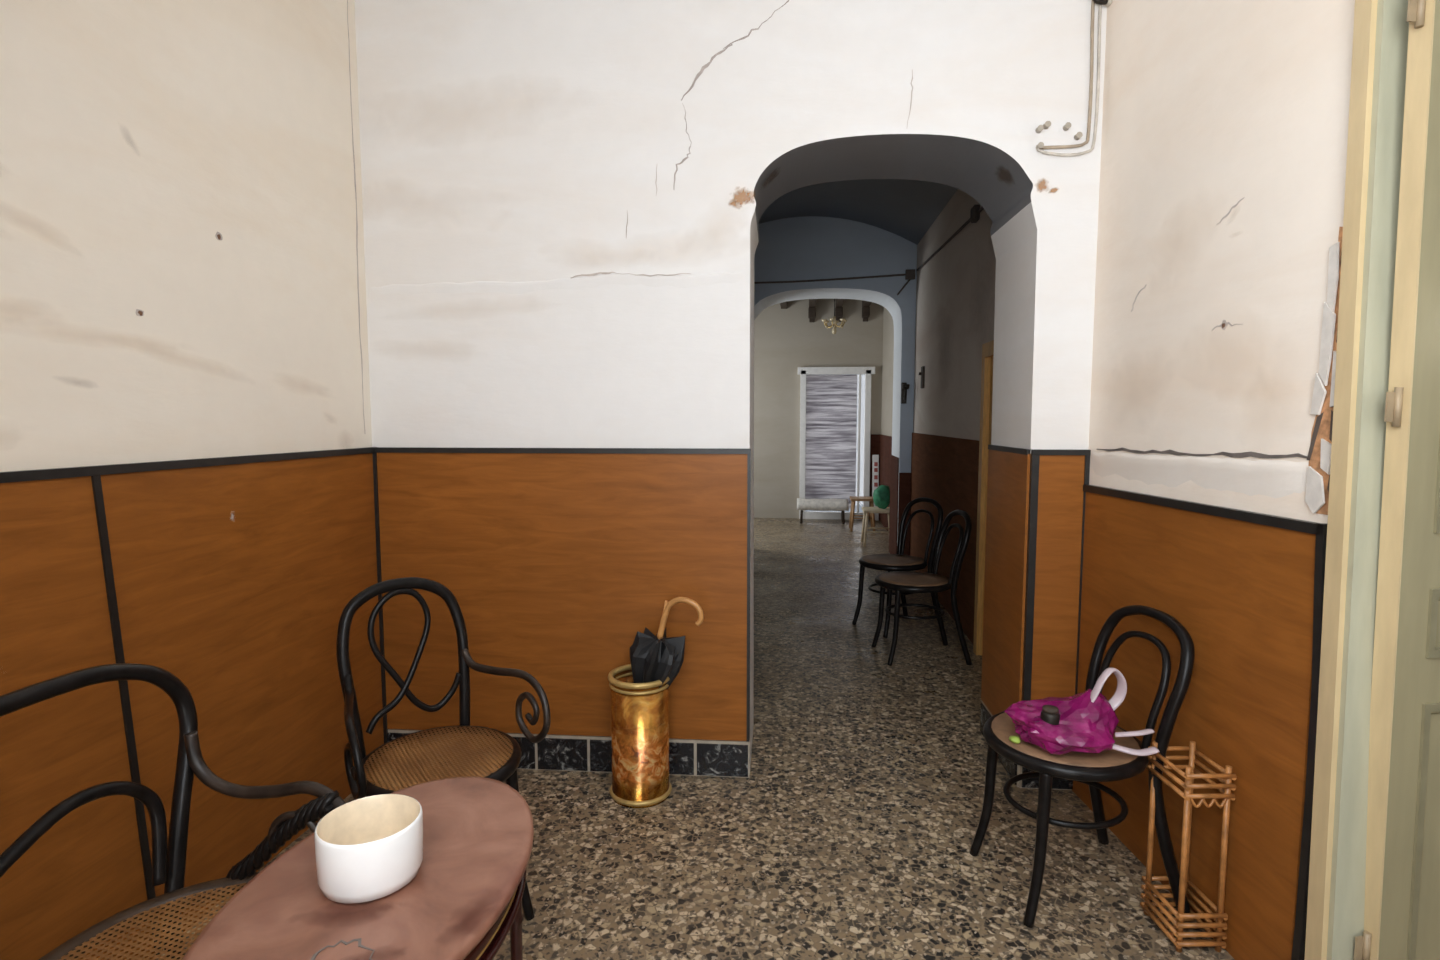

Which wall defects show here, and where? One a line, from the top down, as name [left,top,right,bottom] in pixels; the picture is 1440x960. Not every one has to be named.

crack [655,0,789,195]
crack [571,271,690,279]
crack [1097,447,1308,459]
flaking render [1305,227,1343,515]